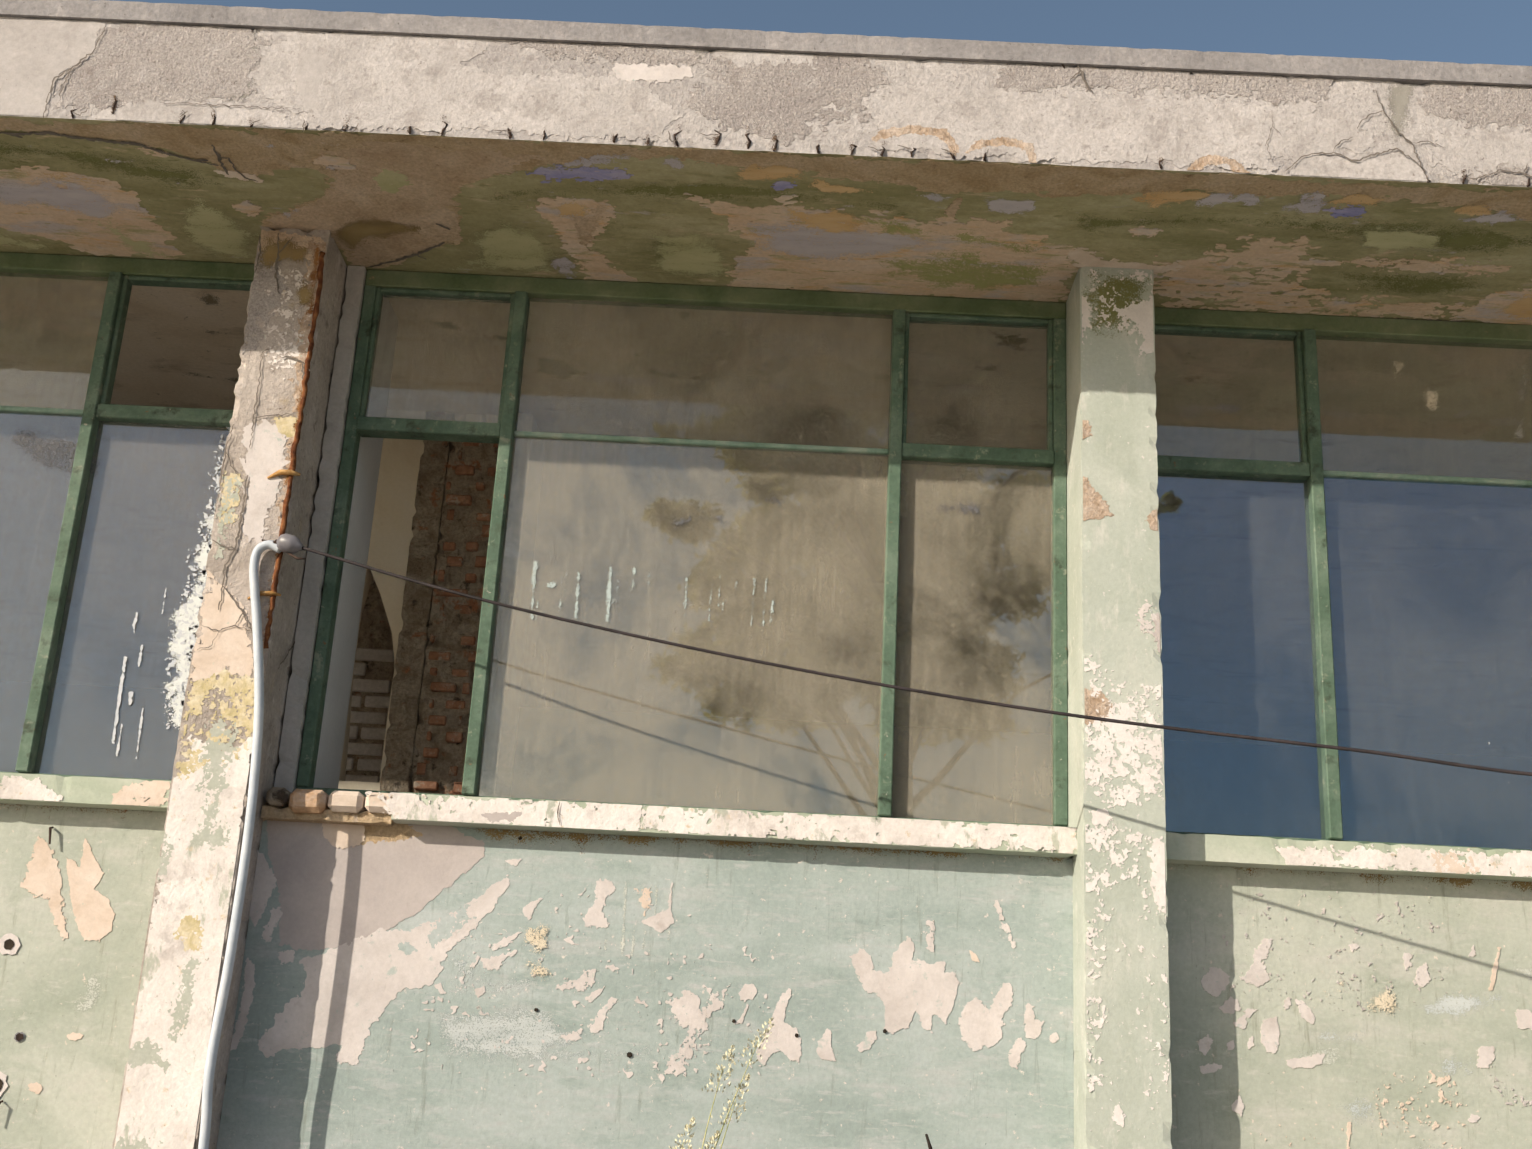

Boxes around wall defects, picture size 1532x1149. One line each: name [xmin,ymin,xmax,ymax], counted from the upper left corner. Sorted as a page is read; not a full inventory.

crack [0,27,295,181]
crack [1266,91,1444,182]
crack [1476,165,1532,180]
spalling [0,22,1532,560]
peeling [1135,599,1160,653]
peeling [0,775,63,802]
spalling [0,933,21,955]
peeling [20,834,115,942]
peeling [111,550,283,1149]
peeling [230,655,1170,1138]
peeling [1194,885,1447,1074]
peeling [1272,843,1532,877]